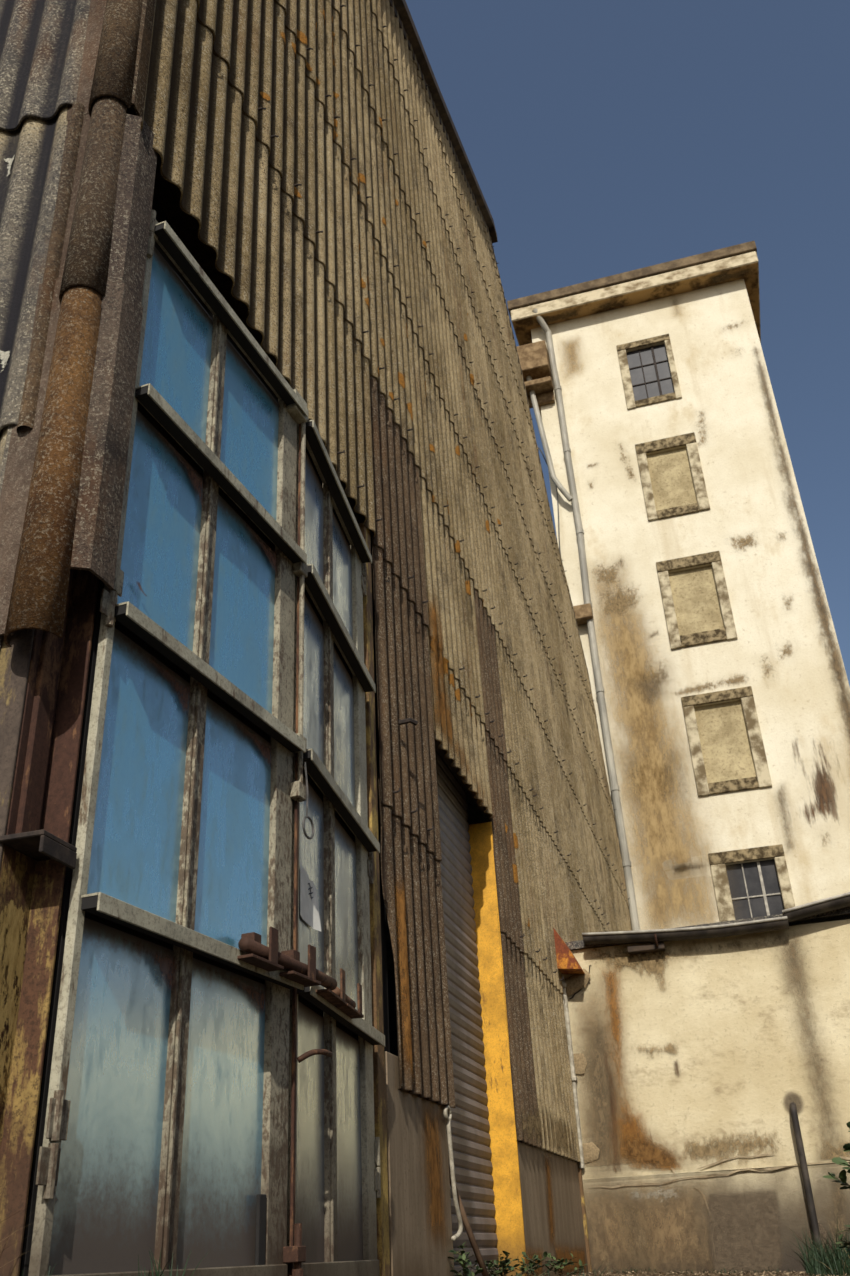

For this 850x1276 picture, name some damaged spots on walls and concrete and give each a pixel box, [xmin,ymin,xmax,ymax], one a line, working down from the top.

water stain [598,561,713,929]
water stain [679,676,744,694]
water stain [805,747,837,822]
peeling [0,900,27,1142]
water stain [584,1004,630,1172]
water stain [639,1043,679,1074]
corrosion [424,1110,445,1234]